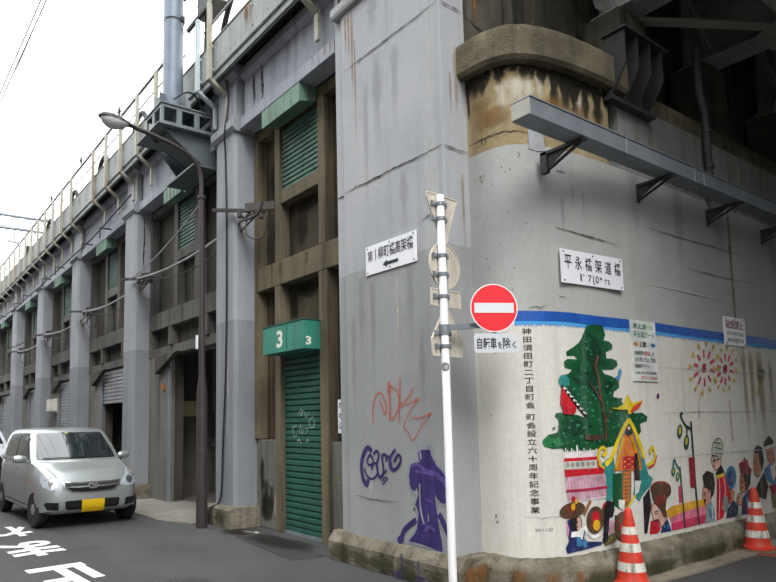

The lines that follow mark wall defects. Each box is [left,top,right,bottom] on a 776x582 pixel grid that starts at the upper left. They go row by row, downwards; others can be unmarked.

crack [341,0,484,74]
leakage [465,64,611,122]
crack [337,130,524,199]
leakage [261,461,273,519]